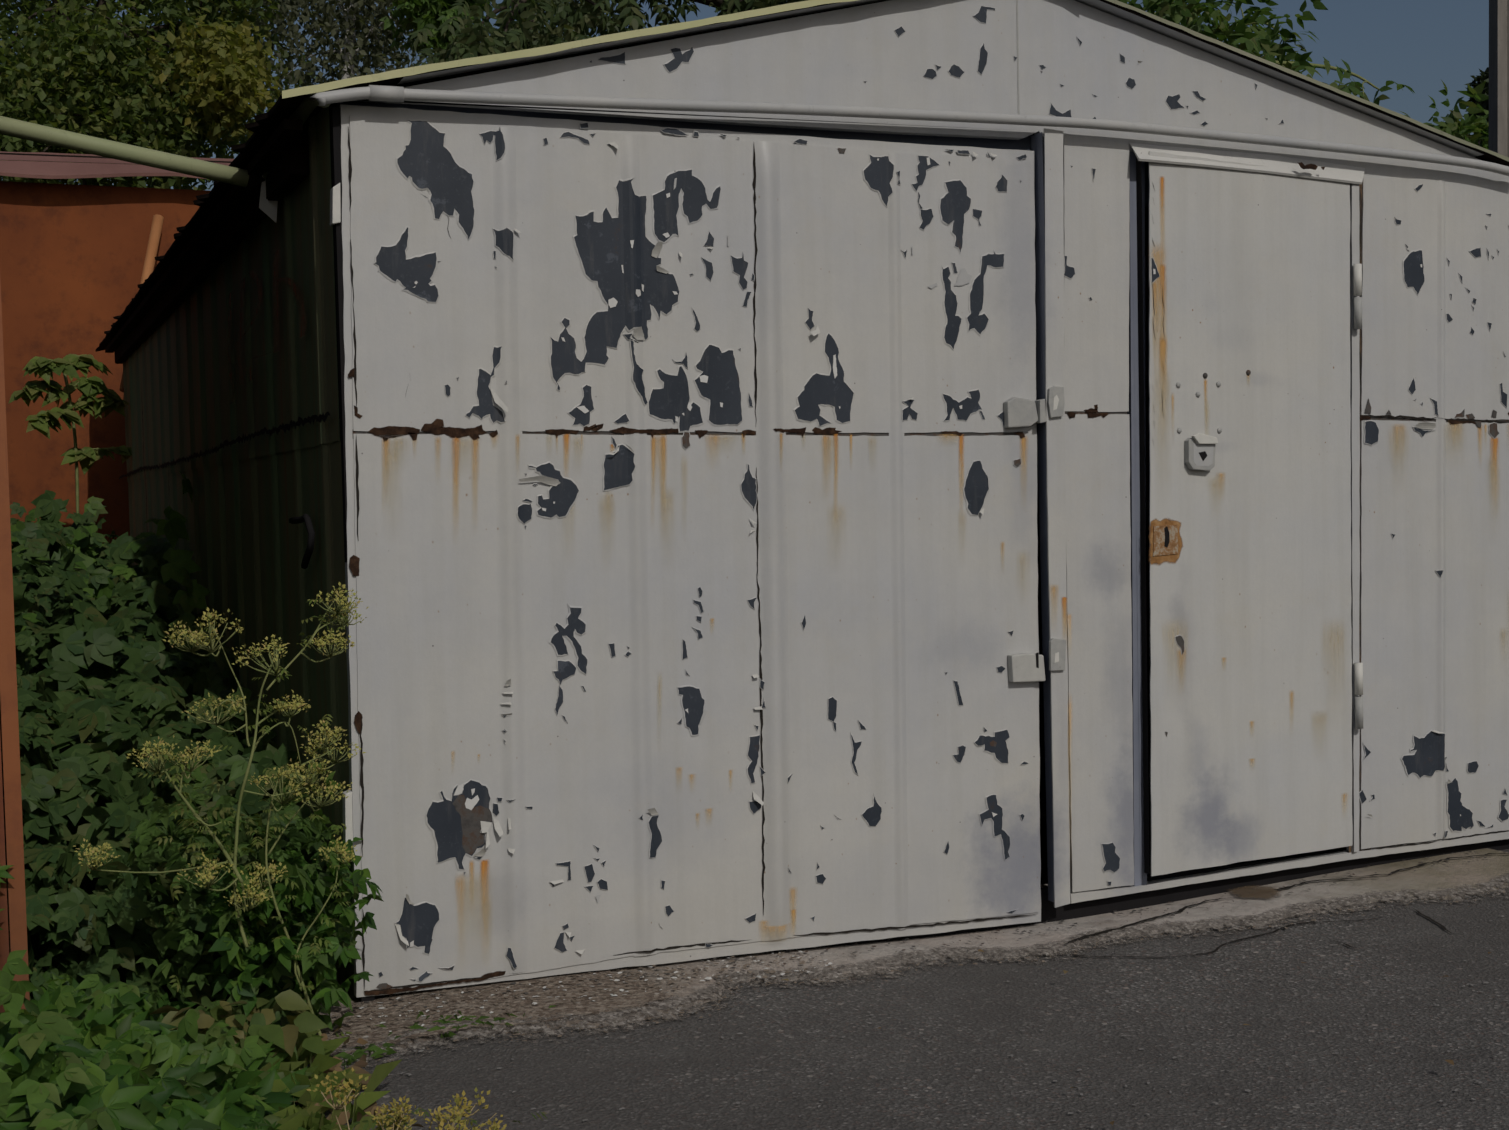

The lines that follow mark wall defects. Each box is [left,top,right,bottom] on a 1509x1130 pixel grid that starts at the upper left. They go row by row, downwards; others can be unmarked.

peeling [396,119,521,269]
peeling [374,226,441,303]
peeling [549,169,755,450]
peeling [863,149,1005,350]
corrosion [1153,254,1165,311]
peeling [793,308,855,427]
corrosion [354,406,498,482]
corrosion [774,427,852,465]
corrosion [941,431,963,459]
corrosion [1149,519,1183,565]
peeling [425,778,533,876]
peeling [1401,729,1509,839]